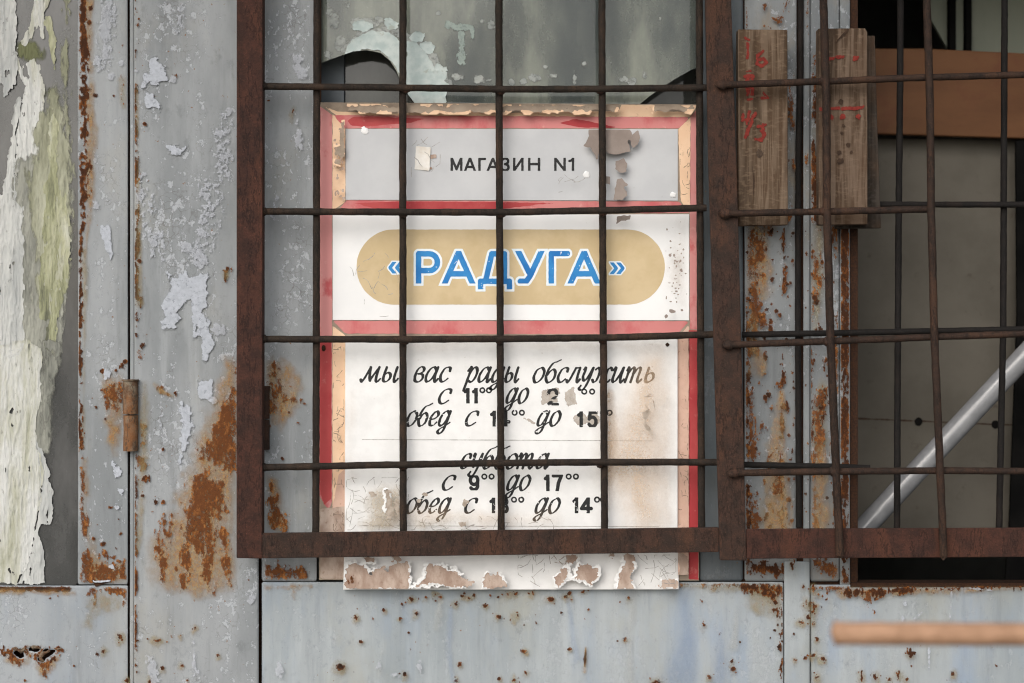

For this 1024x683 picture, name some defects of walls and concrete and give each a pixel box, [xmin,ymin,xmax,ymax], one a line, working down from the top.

corrosion [0,645,64,670]
peeling [0,0,75,586]
corrosion [0,0,237,651]
peeling [135,107,234,363]
corrosion [265,479,290,533]
corrosion [267,361,306,427]
corrosion [745,139,849,529]
corrosion [680,558,1022,682]